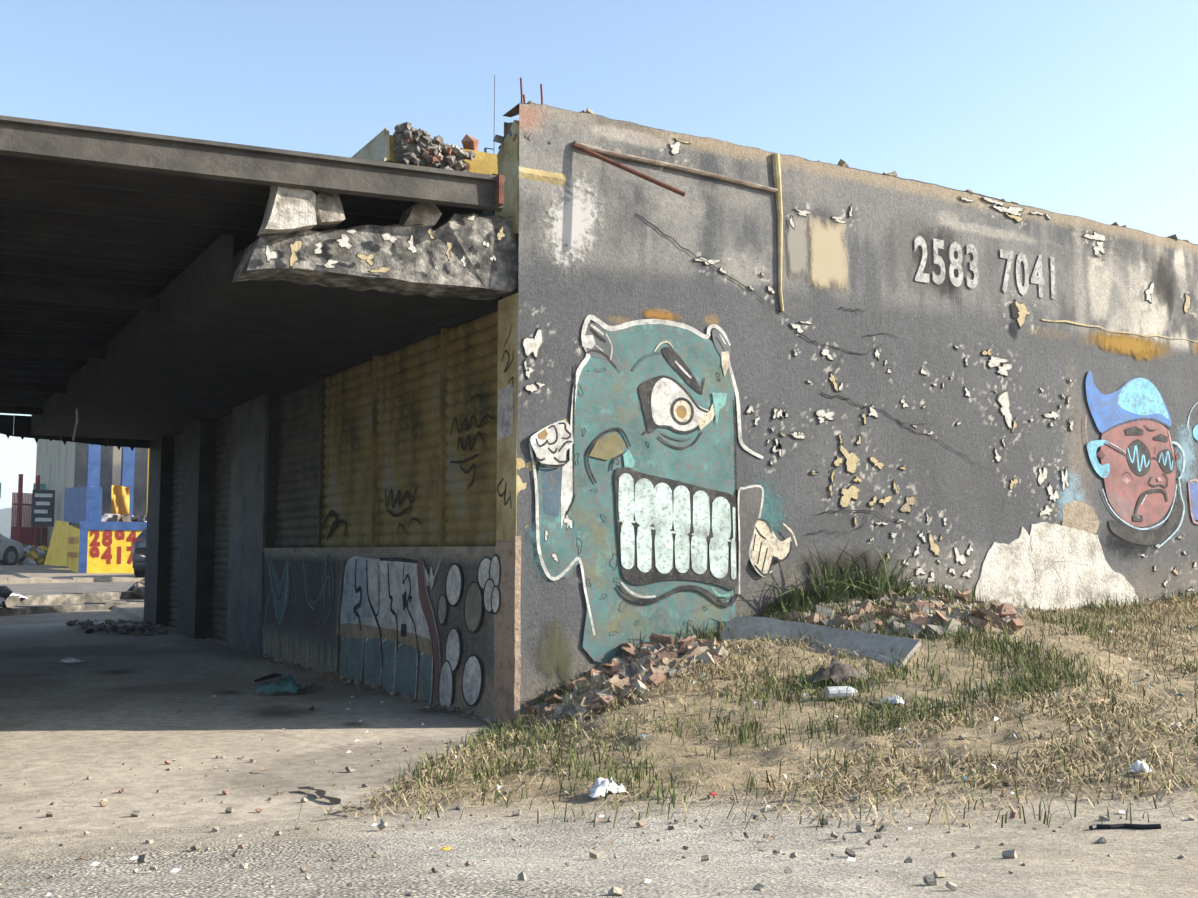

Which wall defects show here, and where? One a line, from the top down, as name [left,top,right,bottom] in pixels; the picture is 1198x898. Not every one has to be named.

spalling [393,122,479,172]
peeling [265,229,392,273]
peeling [380,228,467,271]
peeling [482,226,506,263]
peeling [787,204,853,289]
crack [636,214,989,470]
peeling [820,348,843,392]
spalling [1011,298,1031,329]
peeling [954,345,1074,463]
peeling [746,405,806,465]
peeling [810,404,917,542]
flaking render [887,466,1154,612]